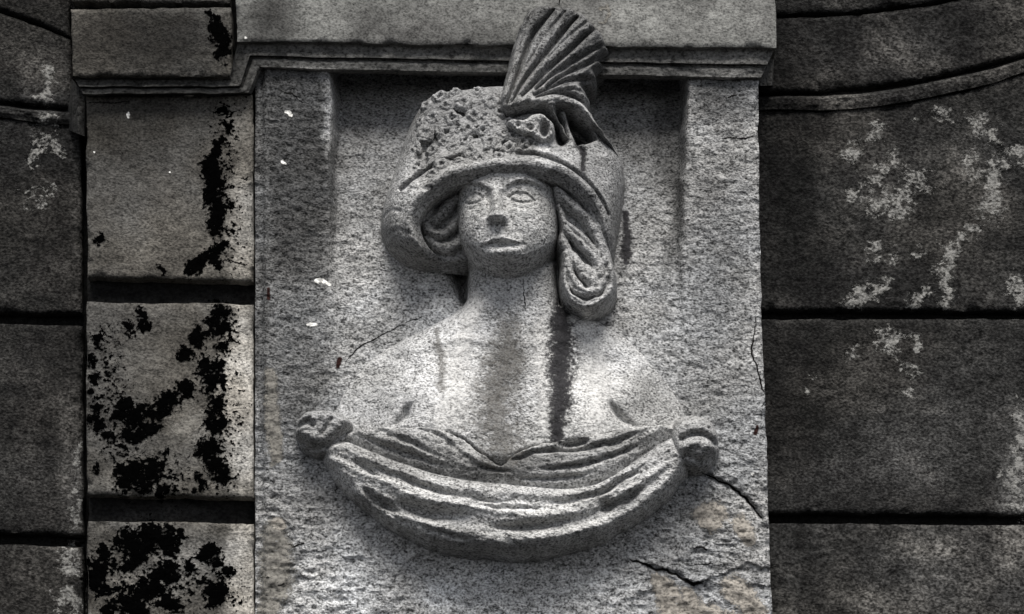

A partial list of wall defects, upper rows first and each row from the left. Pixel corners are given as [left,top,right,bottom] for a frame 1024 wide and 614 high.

damp [204,9,233,66]
damp [183,88,260,283]
damp [848,152,930,219]
damp [909,146,1024,309]
damp [848,282,890,309]
crack [346,316,423,361]
damp [535,301,611,443]
damp [58,296,261,614]
crack [702,473,762,518]
crack [630,546,713,587]